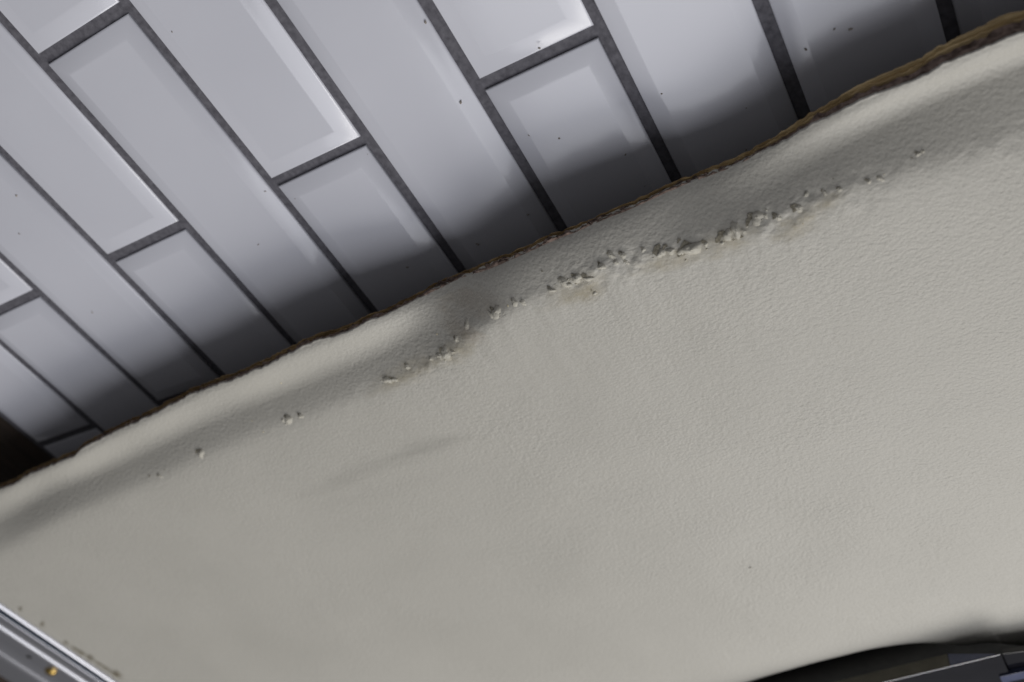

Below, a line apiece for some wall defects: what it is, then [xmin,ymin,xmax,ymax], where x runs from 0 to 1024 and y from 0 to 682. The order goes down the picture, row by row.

peeling [641,221,748,261]
peeling [547,250,630,295]